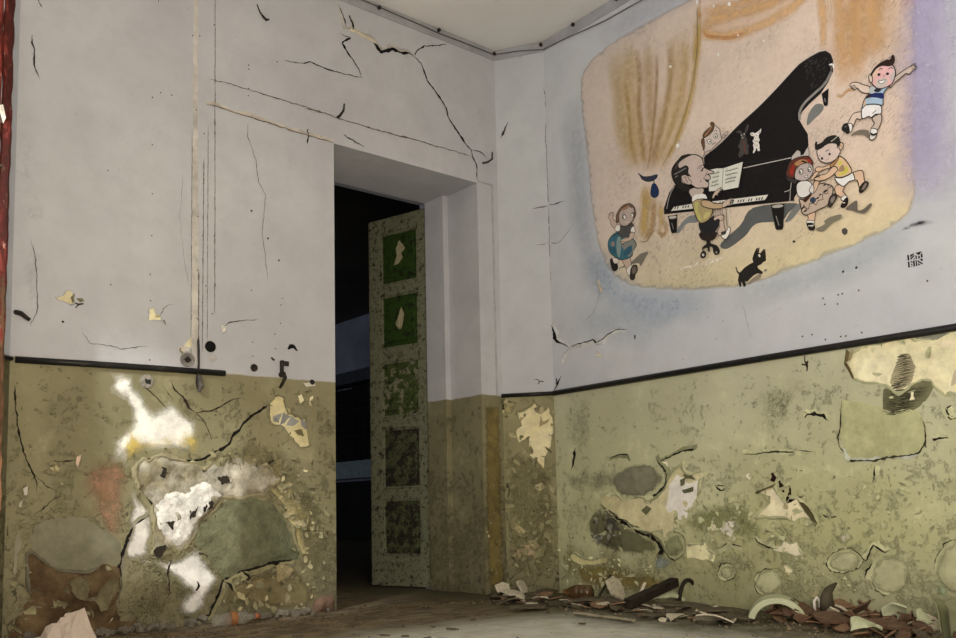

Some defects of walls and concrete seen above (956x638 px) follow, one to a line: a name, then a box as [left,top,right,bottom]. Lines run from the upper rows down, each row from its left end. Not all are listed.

crack [206,4,486,278]
crack [14,387,62,519]
peeling [55,290,84,306]
crack [117,458,159,581]
crack [145,382,267,465]
spalling [125,382,335,614]
crack [535,265,627,390]
peeling [485,398,922,597]
peeling [843,331,956,399]
crack [195,559,294,624]